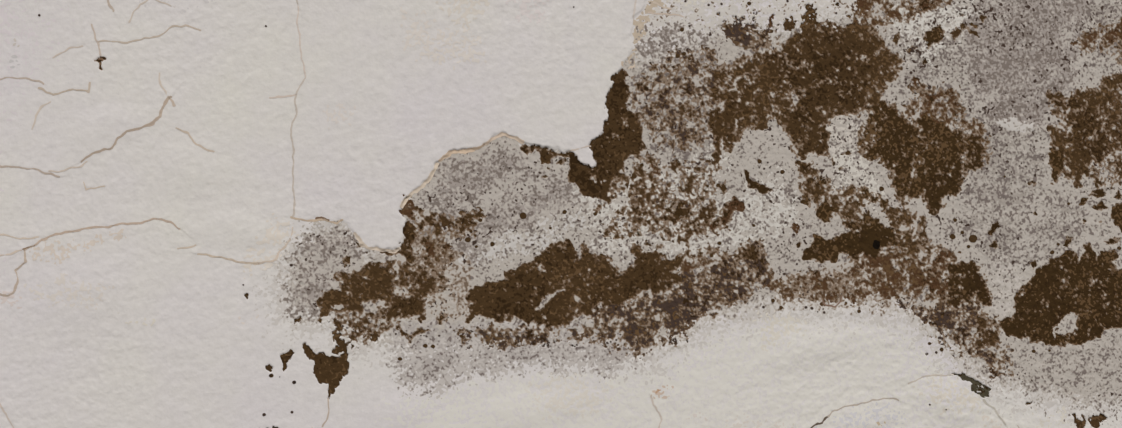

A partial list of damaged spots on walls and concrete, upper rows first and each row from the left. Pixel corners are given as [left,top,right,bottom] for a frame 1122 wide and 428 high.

crack [0,0,401,297]
peeling [265,0,1122,428]